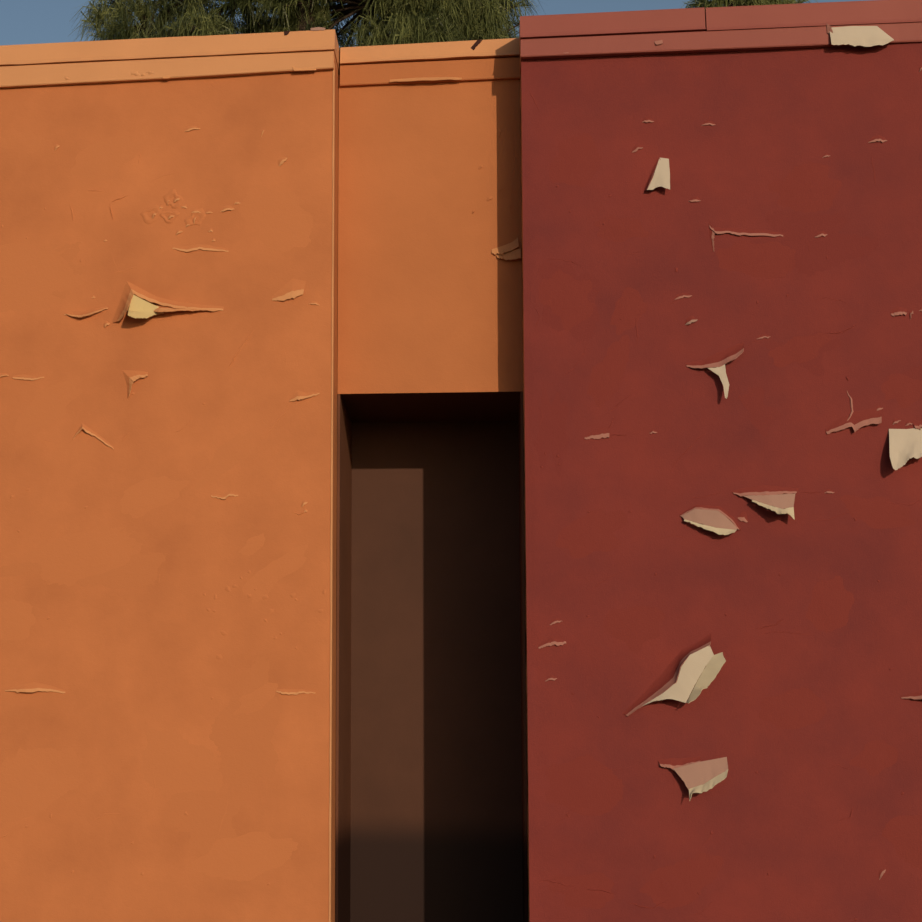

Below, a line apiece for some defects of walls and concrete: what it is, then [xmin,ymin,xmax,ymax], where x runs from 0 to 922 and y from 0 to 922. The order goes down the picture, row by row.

peeling [826,23,894,47]
peeling [644,157,670,191]
peeling [709,222,783,251]
peeling [112,281,224,323]
peeling [685,342,744,399]
peeling [825,405,922,470]
peeling [680,505,748,535]
peeling [732,485,799,520]
peeling [622,633,726,716]
peeling [658,757,728,801]